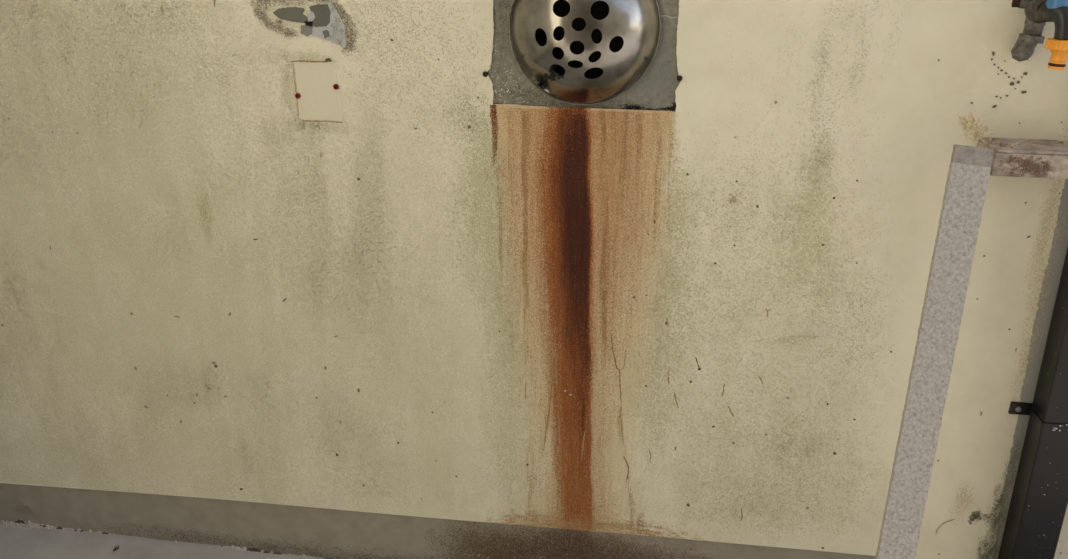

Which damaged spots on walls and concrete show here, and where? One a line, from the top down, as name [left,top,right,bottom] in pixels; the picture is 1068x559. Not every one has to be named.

peeling [251,0,358,62]
water stain [977,415,1030,559]